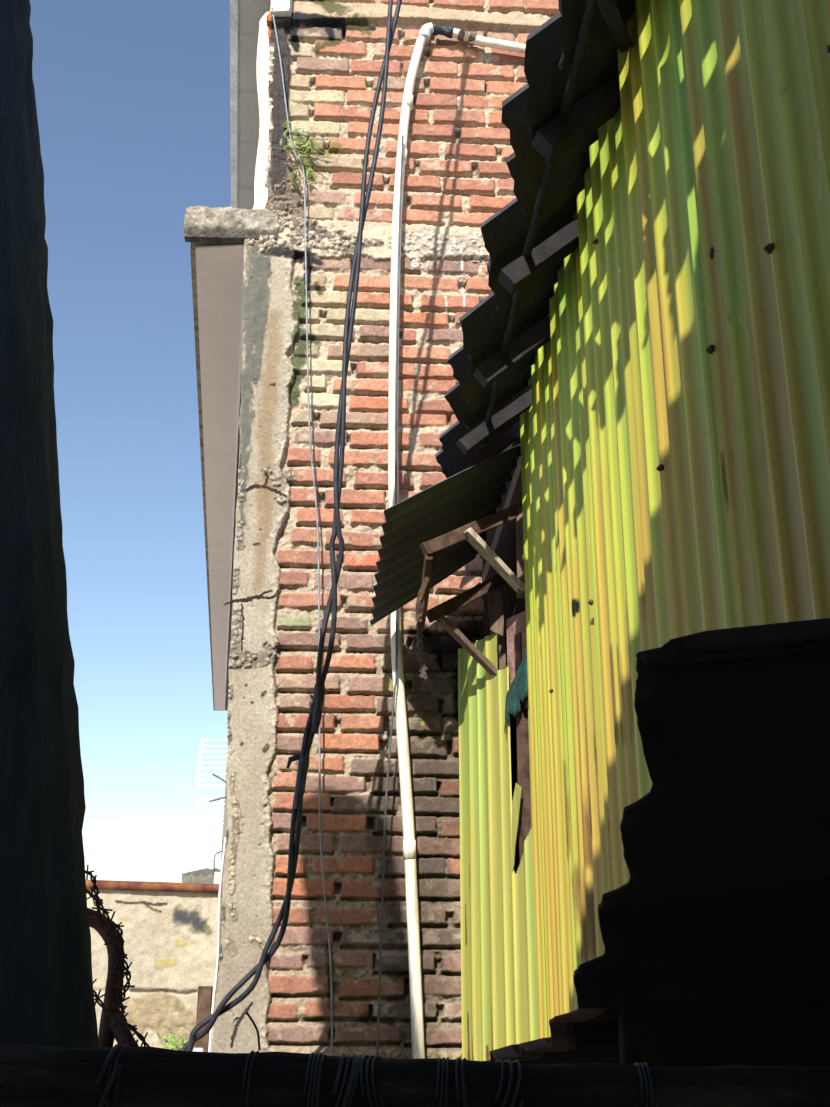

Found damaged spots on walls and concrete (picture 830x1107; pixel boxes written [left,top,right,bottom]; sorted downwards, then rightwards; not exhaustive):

crack [239,454,287,497]
crack [224,590,277,651]